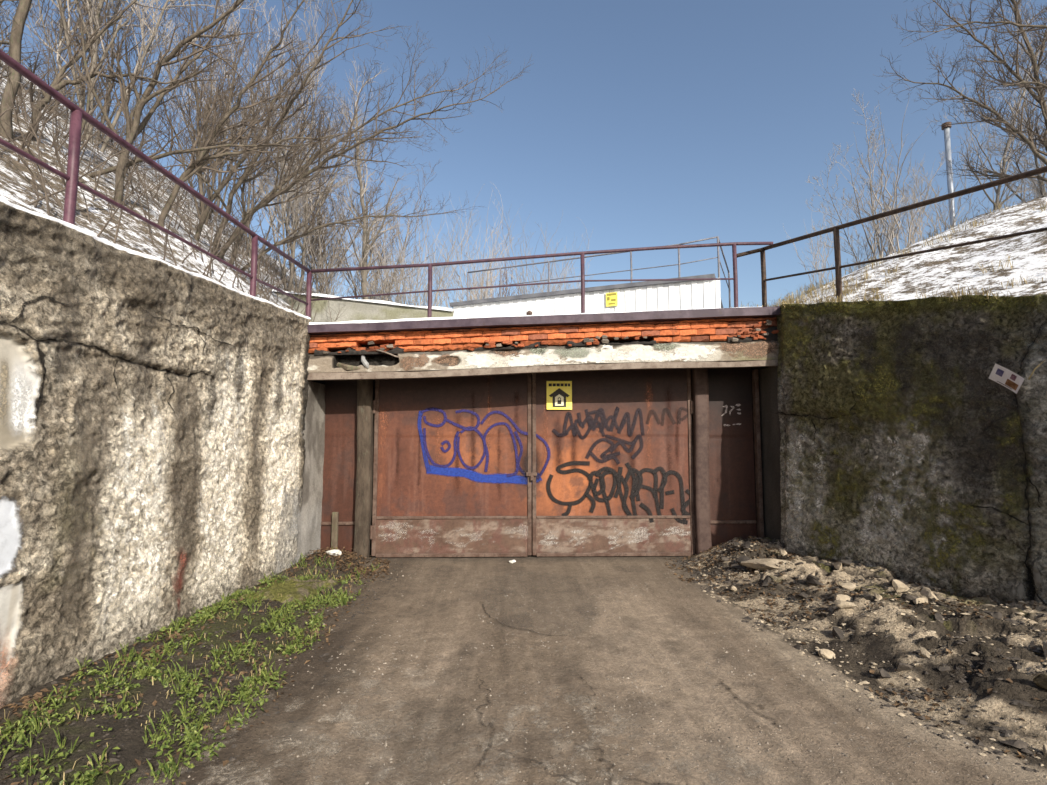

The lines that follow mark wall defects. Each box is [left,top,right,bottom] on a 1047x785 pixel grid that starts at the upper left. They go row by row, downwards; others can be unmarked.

spalling [0,334,40,450]
water stain [54,281,79,372]
crack [0,296,235,415]
water stain [63,304,247,623]
spalling [314,341,404,371]
peeling [464,334,717,368]
water stain [784,435,823,527]
water stain [887,326,1021,494]
crack [968,321,1047,606]
flaking render [0,496,24,681]